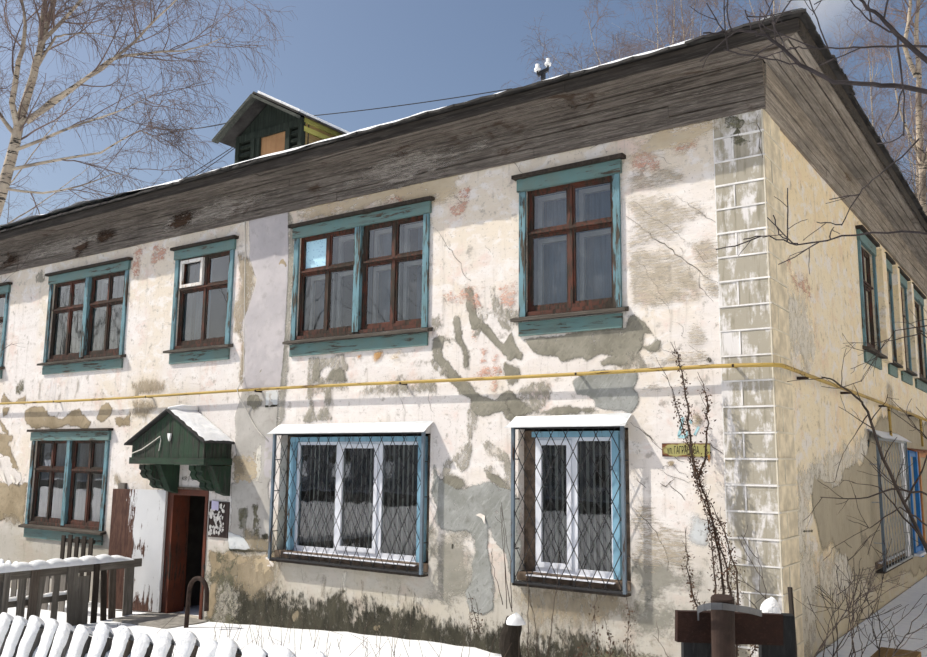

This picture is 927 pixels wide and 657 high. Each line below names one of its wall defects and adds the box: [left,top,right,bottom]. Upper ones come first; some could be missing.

peeling [628,152,719,307]
spalling [0,380,164,524]
damp [205,504,504,654]